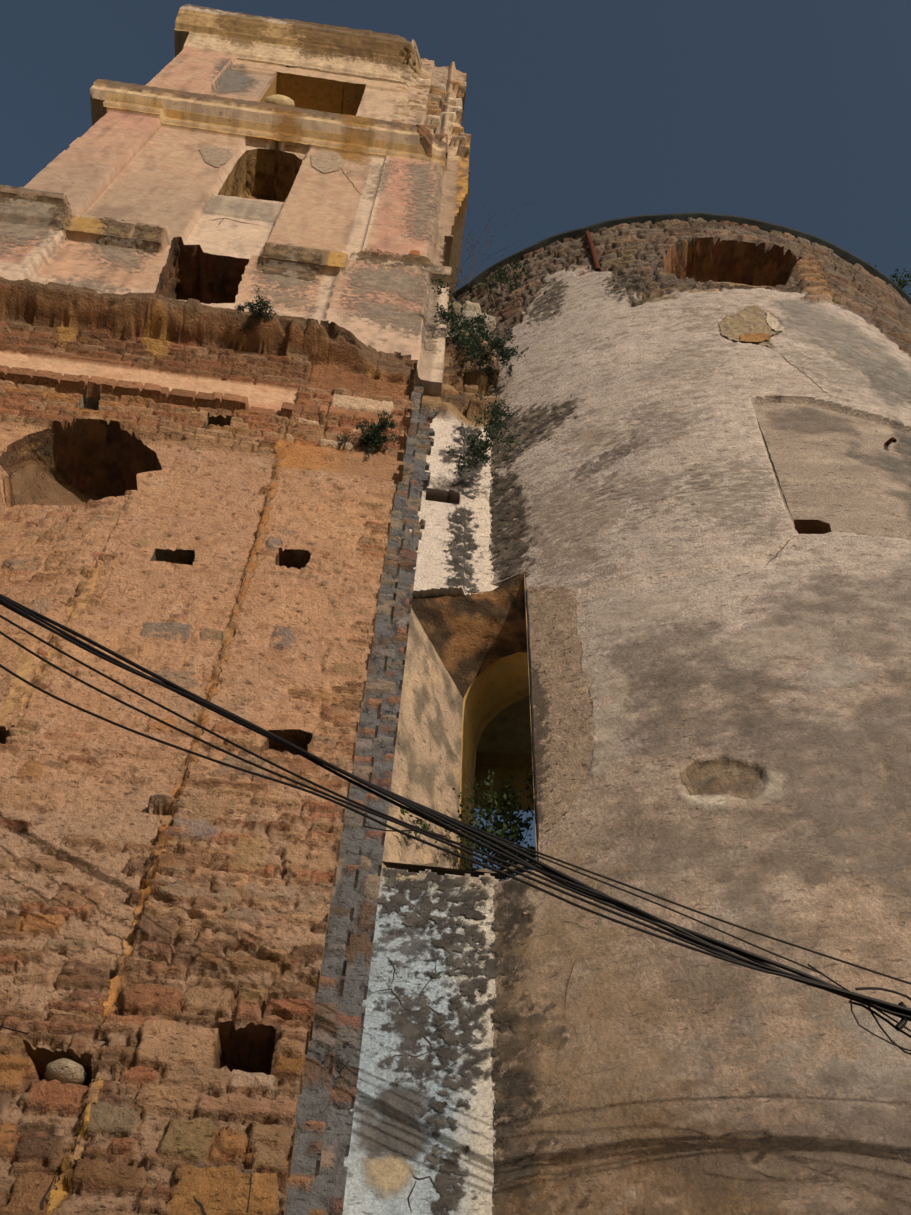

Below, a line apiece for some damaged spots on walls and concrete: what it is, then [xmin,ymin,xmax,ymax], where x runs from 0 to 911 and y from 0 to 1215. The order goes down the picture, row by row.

flaking render [719,305,784,348]
crack [10,563,107,725]
flaking render [678,760,784,810]
leakage [357,867,595,1215]
leakage [659,1122,911,1215]